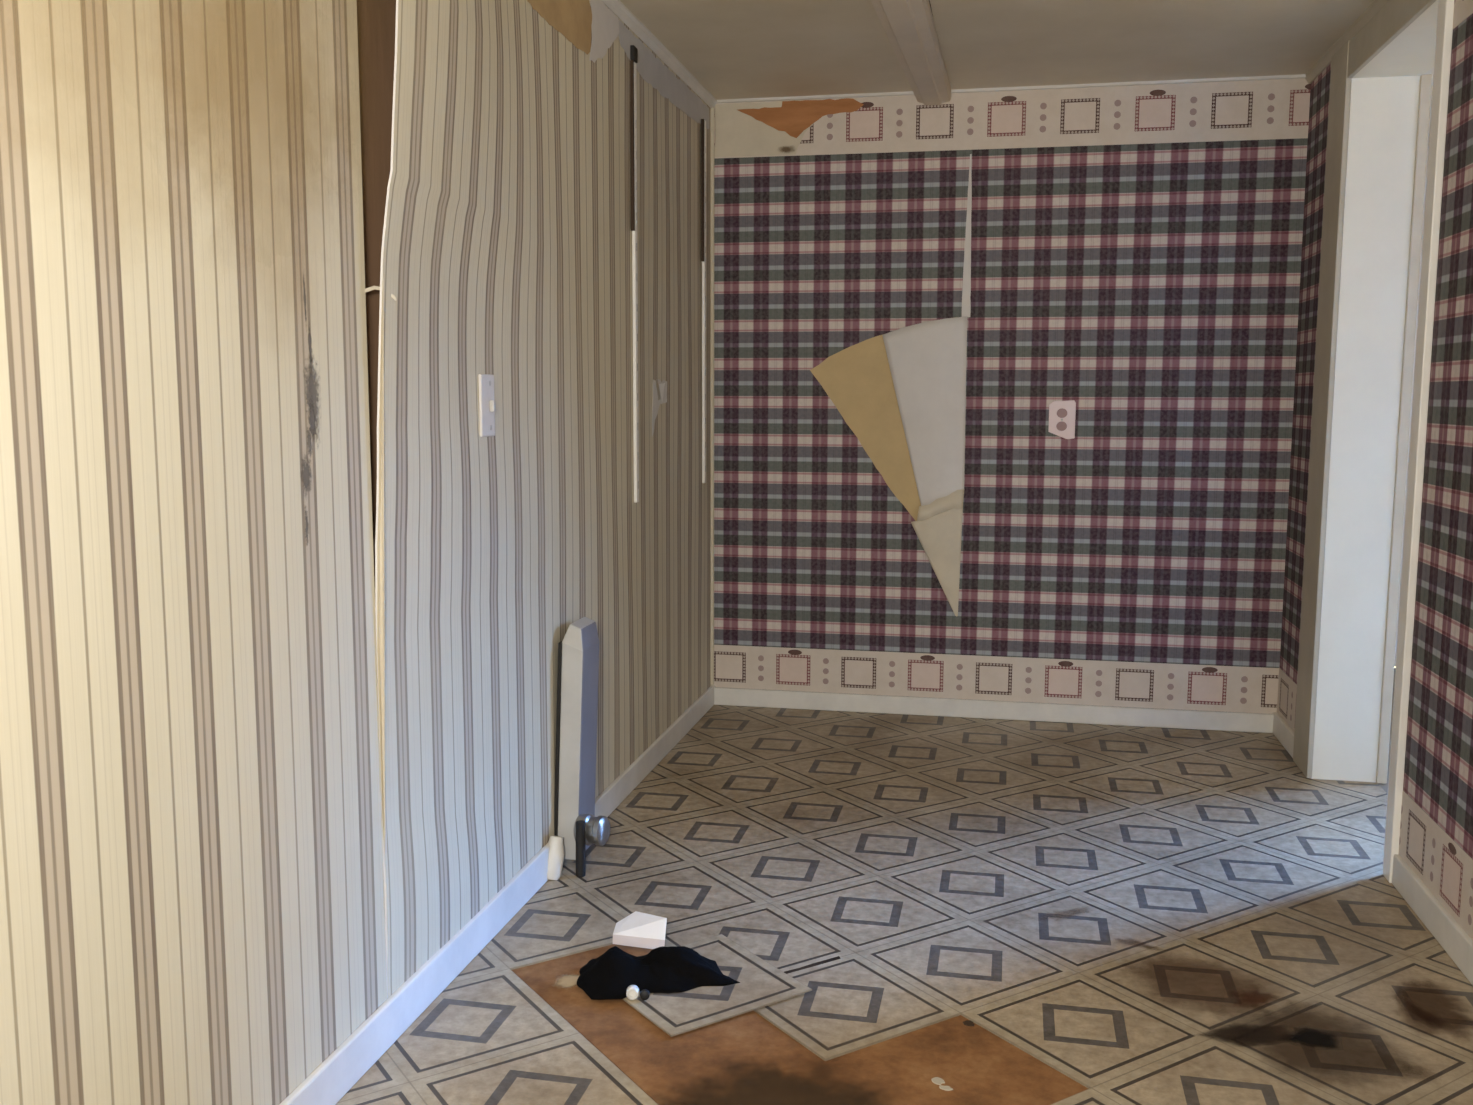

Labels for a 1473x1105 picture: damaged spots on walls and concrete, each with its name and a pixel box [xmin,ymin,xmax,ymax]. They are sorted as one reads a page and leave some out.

peeling [527,0,864,157]
damp [302,280,319,543]
peeling [512,944,1087,1105]